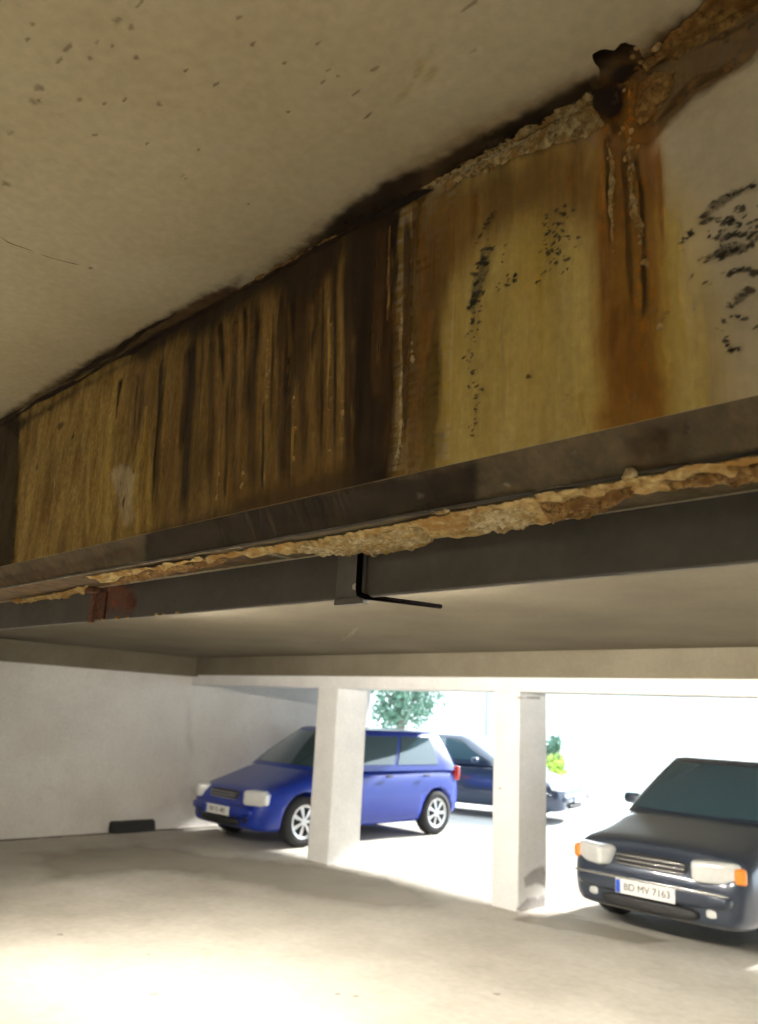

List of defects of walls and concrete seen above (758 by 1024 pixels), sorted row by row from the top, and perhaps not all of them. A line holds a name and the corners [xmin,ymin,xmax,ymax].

leakage [0,0,758,567]
hole [591,42,639,136]
corrosion [594,80,672,430]